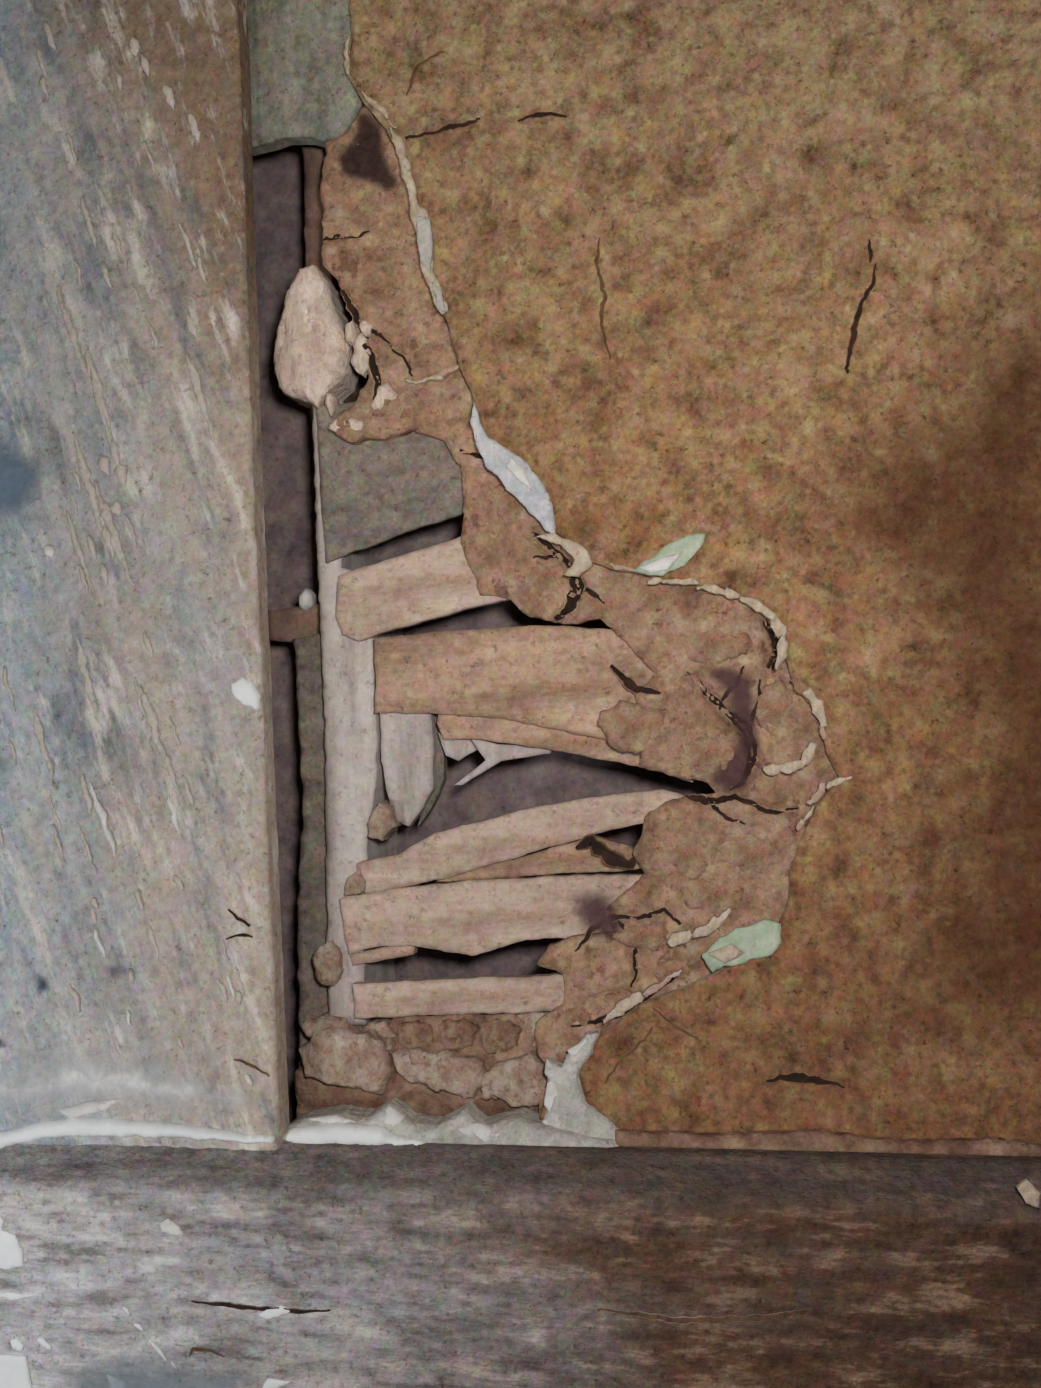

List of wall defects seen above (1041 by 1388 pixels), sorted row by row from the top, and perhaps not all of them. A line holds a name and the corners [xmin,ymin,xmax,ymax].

crack [406,51,445,96]
crack [405,118,480,140]
crack [518,111,567,122]
crack [594,237,611,359]
crack [844,239,877,373]
flaking render [320,35,852,1140]
crack [226,909,253,940]
crack [234,1059,270,1077]
crack [766,1071,845,1089]
crack [191,1300,330,1314]